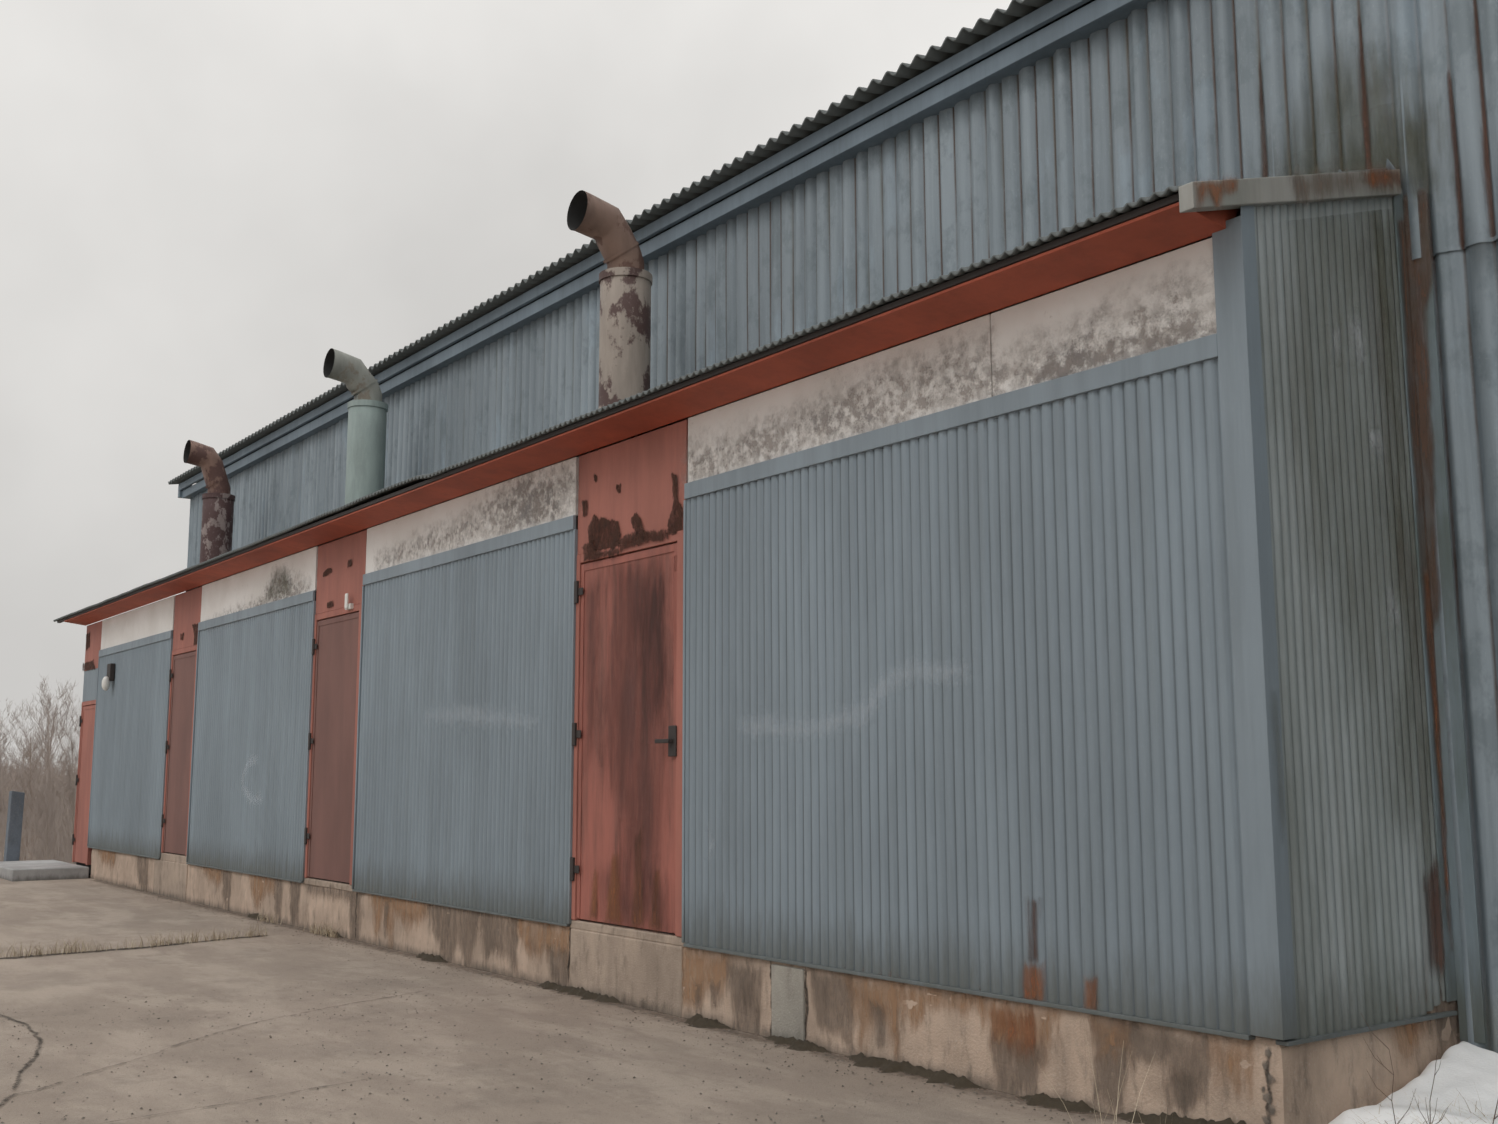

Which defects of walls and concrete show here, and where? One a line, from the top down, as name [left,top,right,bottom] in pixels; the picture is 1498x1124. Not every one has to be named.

corrosion [1259,66,1267,177]
corrosion [1199,180,1236,206]
leakage [690,295,1200,477]
leakage [380,468,575,566]
corrosion [1294,170,1449,974]
crack [0,935,267,959]
leakage [96,856,688,1023]
crack [0,1015,90,1106]
leakage [714,966,791,1048]
leakage [811,975,855,1062]
leakage [946,1022,1206,1119]